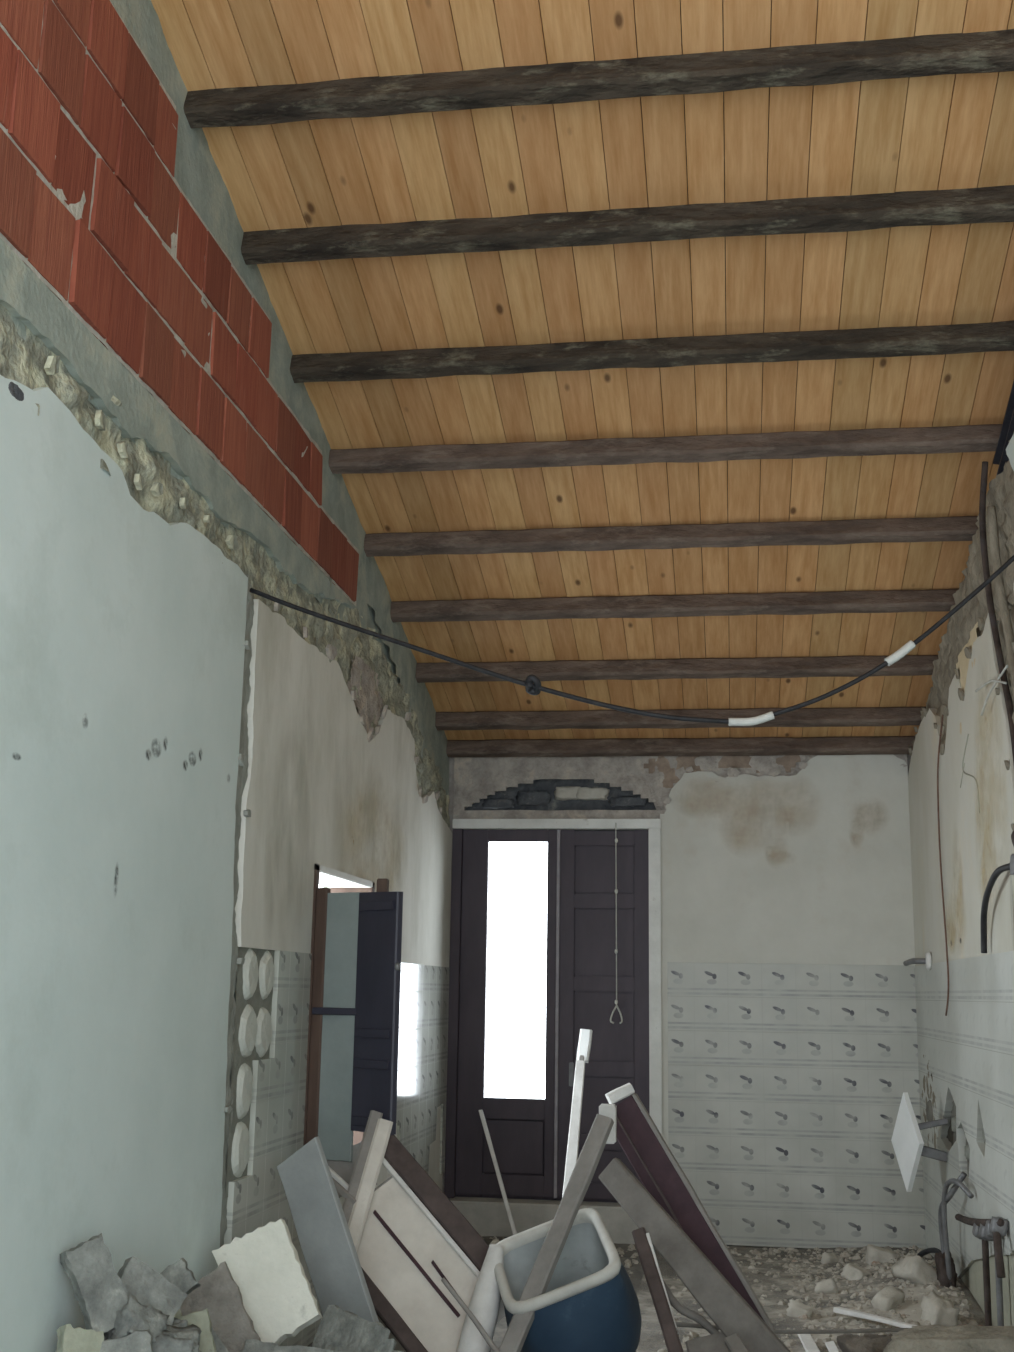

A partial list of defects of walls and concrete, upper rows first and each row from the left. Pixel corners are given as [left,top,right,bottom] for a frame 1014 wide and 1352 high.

flaking render [0,238,818,827]
flaking render [893,460,1014,767]
peeling [921,1055,986,1177]
flaking render [961,1255,1014,1326]